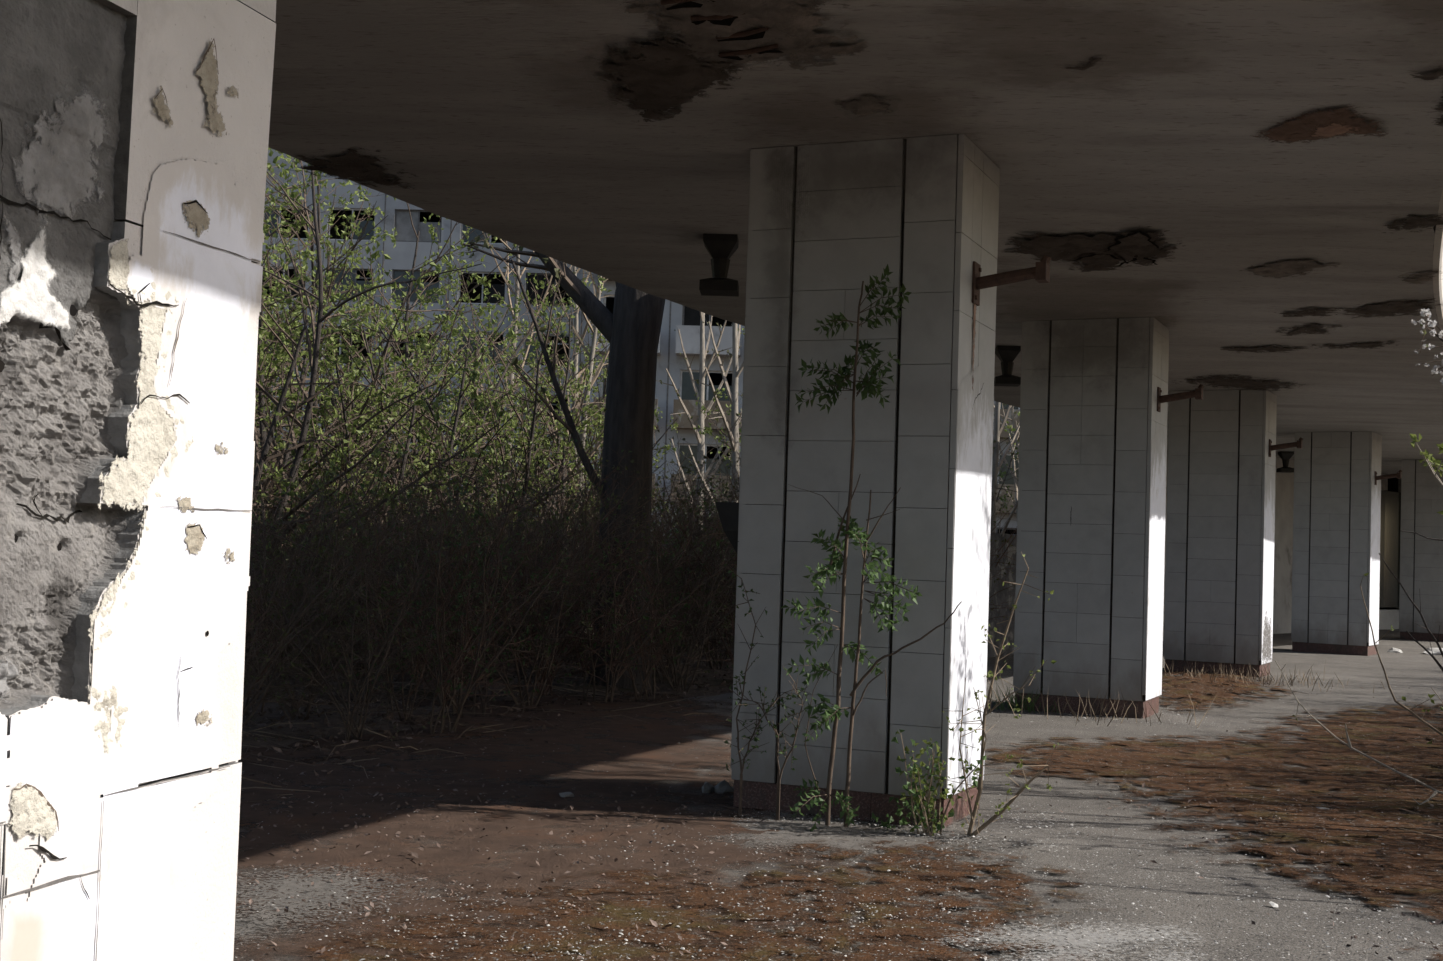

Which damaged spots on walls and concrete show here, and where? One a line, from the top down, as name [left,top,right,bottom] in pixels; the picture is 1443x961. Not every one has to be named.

spalling [588,0,867,122]
spalling [1253,106,1385,143]
spalling [290,148,413,189]
spalling [1005,226,1186,272]
spalling [1221,271,1441,353]
spalling [1174,373,1306,391]